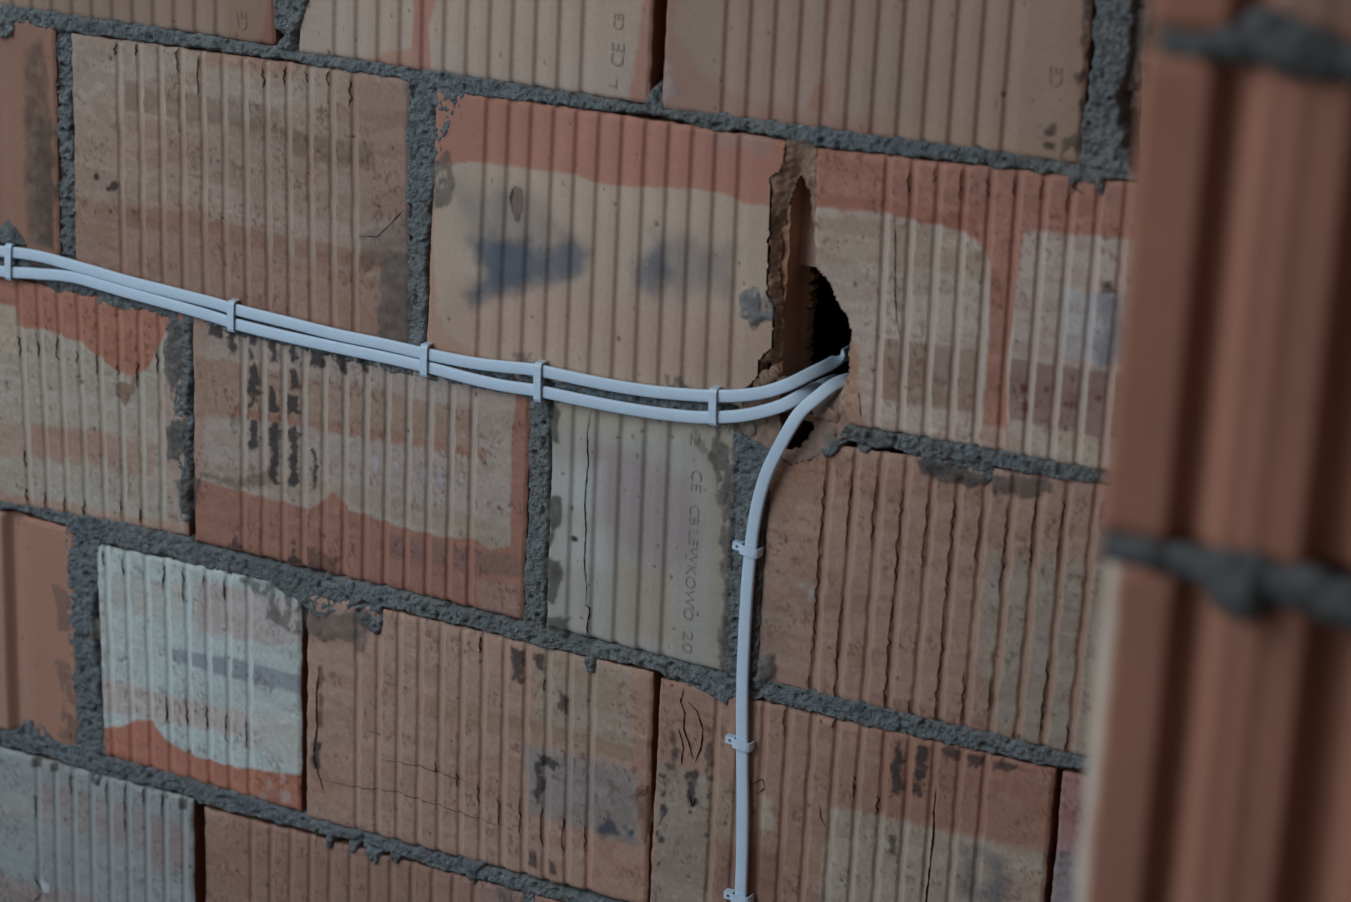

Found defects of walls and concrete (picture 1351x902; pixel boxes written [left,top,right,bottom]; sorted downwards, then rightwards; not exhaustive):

spalling [736,139,852,466]
crack [584,408,592,635]
crack [678,688,703,807]